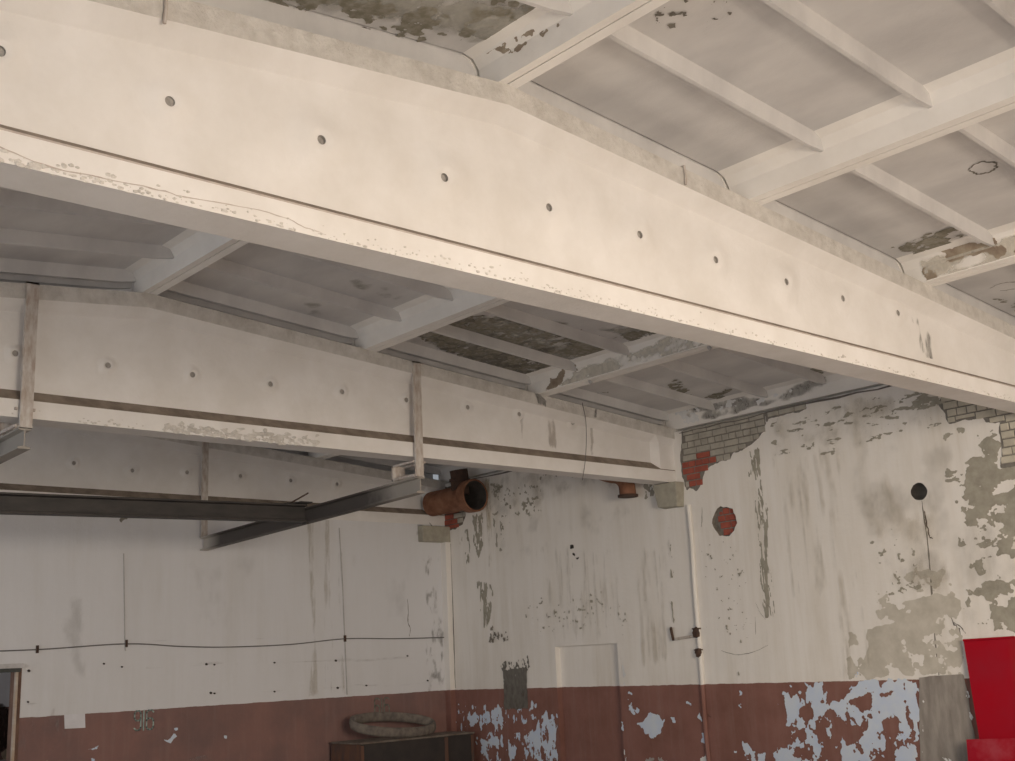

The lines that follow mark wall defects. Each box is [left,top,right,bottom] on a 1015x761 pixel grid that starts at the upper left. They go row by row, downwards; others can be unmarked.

peeling [487,23,559,54]
spalling [0,149,296,231]
peeling [313,225,1015,761]